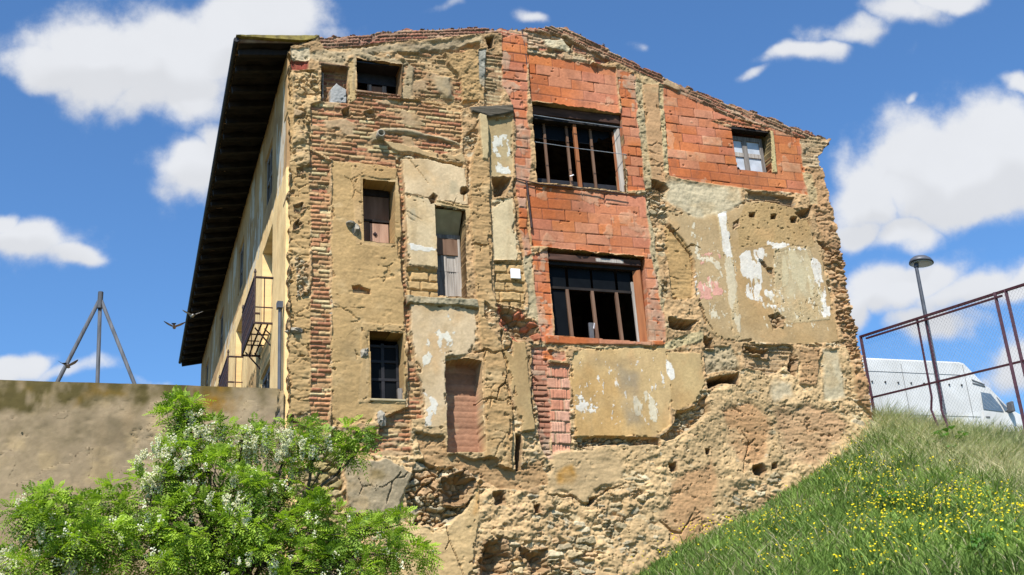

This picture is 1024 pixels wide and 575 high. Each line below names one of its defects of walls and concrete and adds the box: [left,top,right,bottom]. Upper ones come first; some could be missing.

spalling [491,134,513,198]
spalling [292,201,307,231]
spalling [770,204,815,223]
peeling [668,211,831,360]
spalling [363,159,456,457]
spalling [574,371,741,448]
peeling [644,360,675,422]
crack [358,471,409,504]
spalling [435,465,475,509]
spalling [492,489,507,507]
spalling [752,461,779,478]
spalling [475,534,552,575]